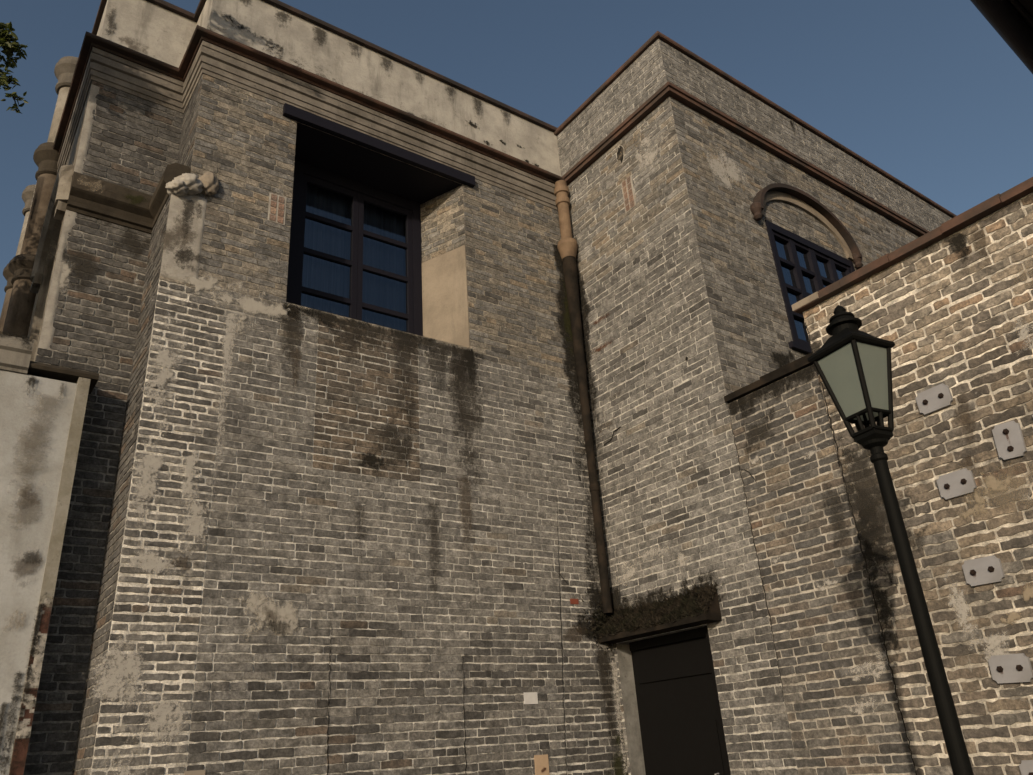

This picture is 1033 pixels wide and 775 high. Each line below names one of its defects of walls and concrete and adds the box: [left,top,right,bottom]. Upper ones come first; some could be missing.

water stain [209,14,283,59]
water stain [278,303,528,477]
water stain [550,237,780,621]
water stain [822,443,900,681]
peeling [9,592,53,775]
water stain [848,697,885,715]